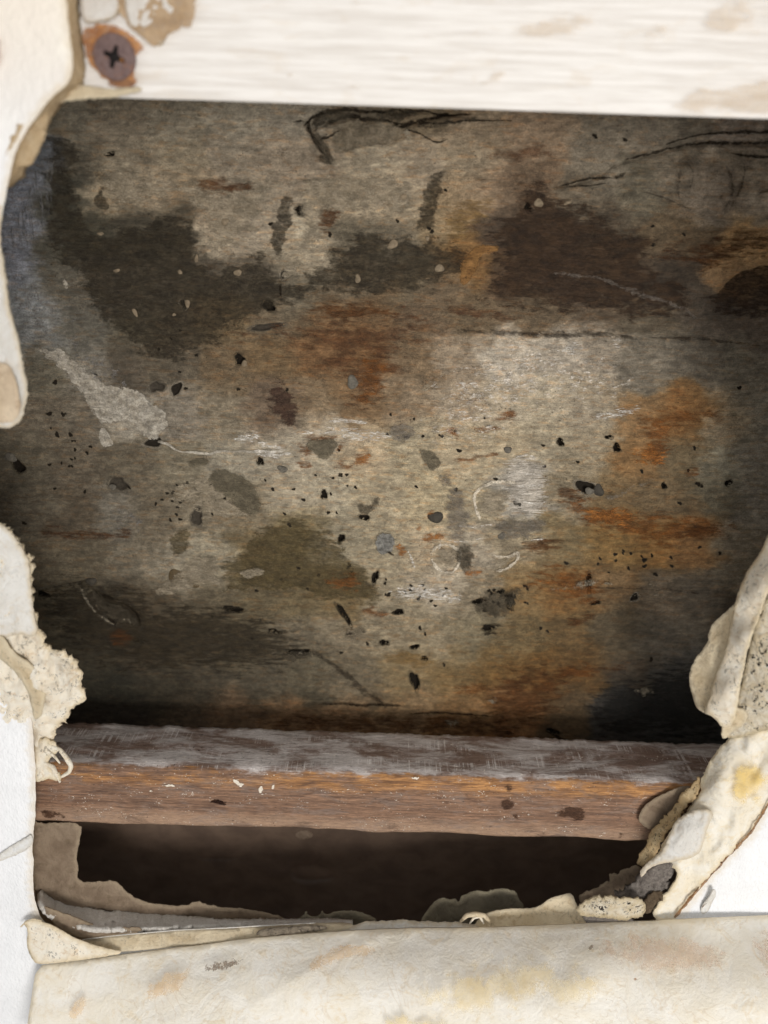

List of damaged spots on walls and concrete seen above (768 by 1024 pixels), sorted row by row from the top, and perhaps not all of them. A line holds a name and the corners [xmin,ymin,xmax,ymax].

rust [82,23,144,87]
crack [297,107,512,164]
damp [11,137,466,362]
damp [476,181,687,321]
damp [709,265,768,317]
rust [289,301,426,410]
rust [267,382,298,426]
peeling [689,536,768,728]
flaking render [37,889,353,939]
flaking render [614,862,675,914]